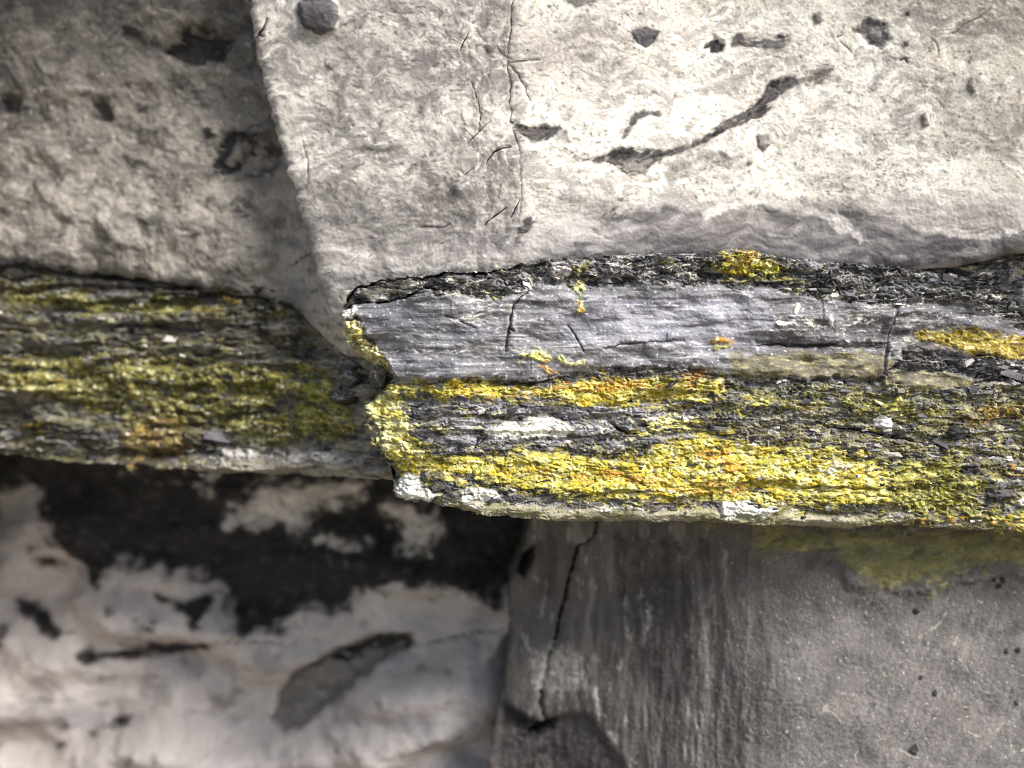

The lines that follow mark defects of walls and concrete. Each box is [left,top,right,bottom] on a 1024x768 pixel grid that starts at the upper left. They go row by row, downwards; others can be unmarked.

crack [465,0,541,225]
crack [539,521,598,718]